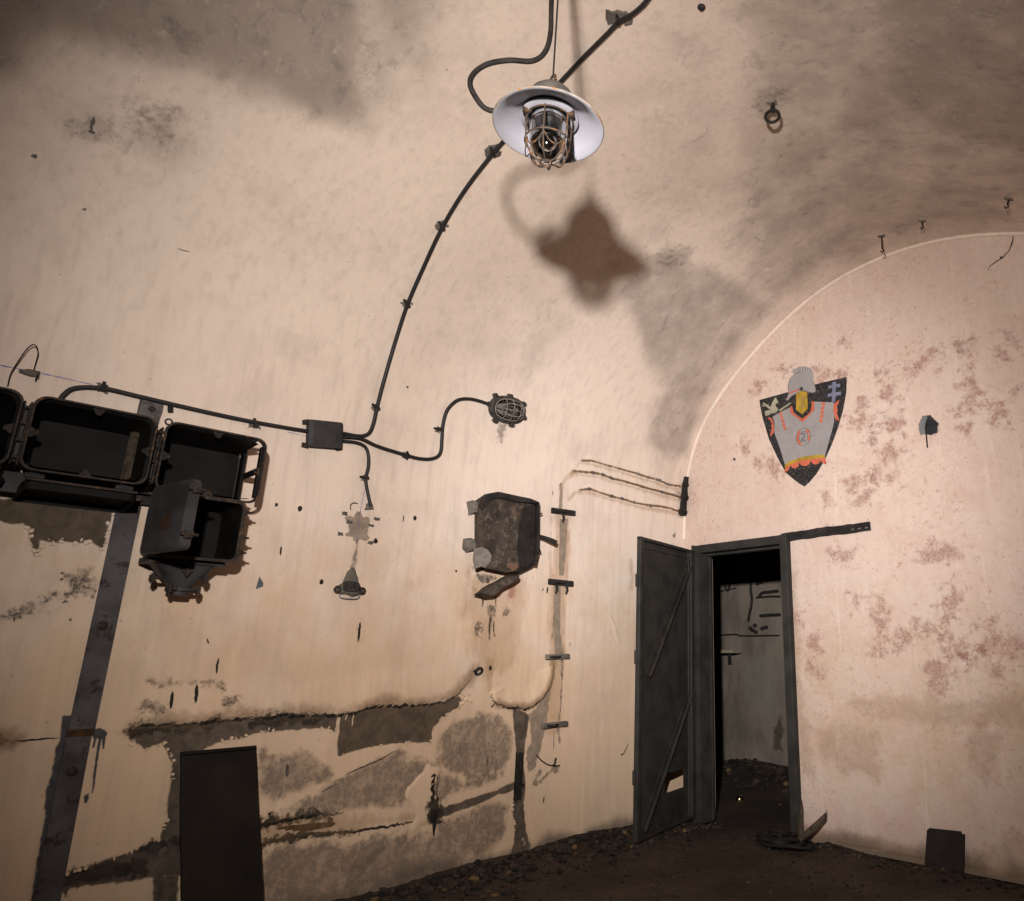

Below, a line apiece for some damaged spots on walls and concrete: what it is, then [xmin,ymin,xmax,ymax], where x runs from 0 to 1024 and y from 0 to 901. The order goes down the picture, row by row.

spalling [0,498,114,556]
spalling [62,692,530,901]